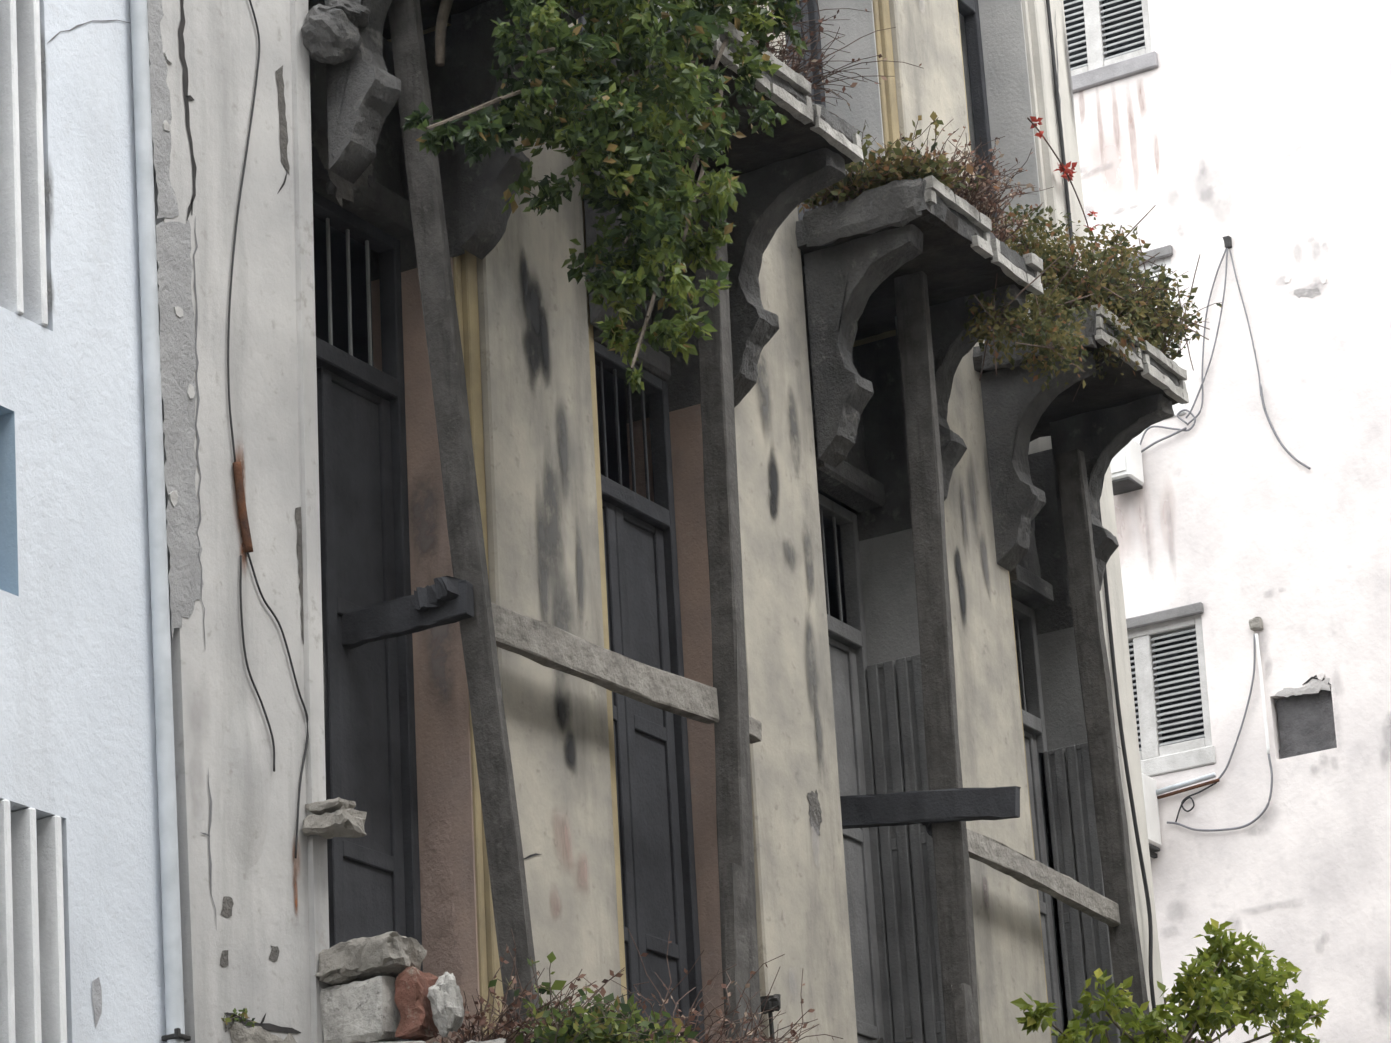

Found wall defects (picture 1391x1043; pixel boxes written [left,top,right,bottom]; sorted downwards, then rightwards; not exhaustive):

peeling [147,0,204,639]
crack [178,0,206,651]
damp [521,256,550,378]
spalling [225,1012,297,1043]